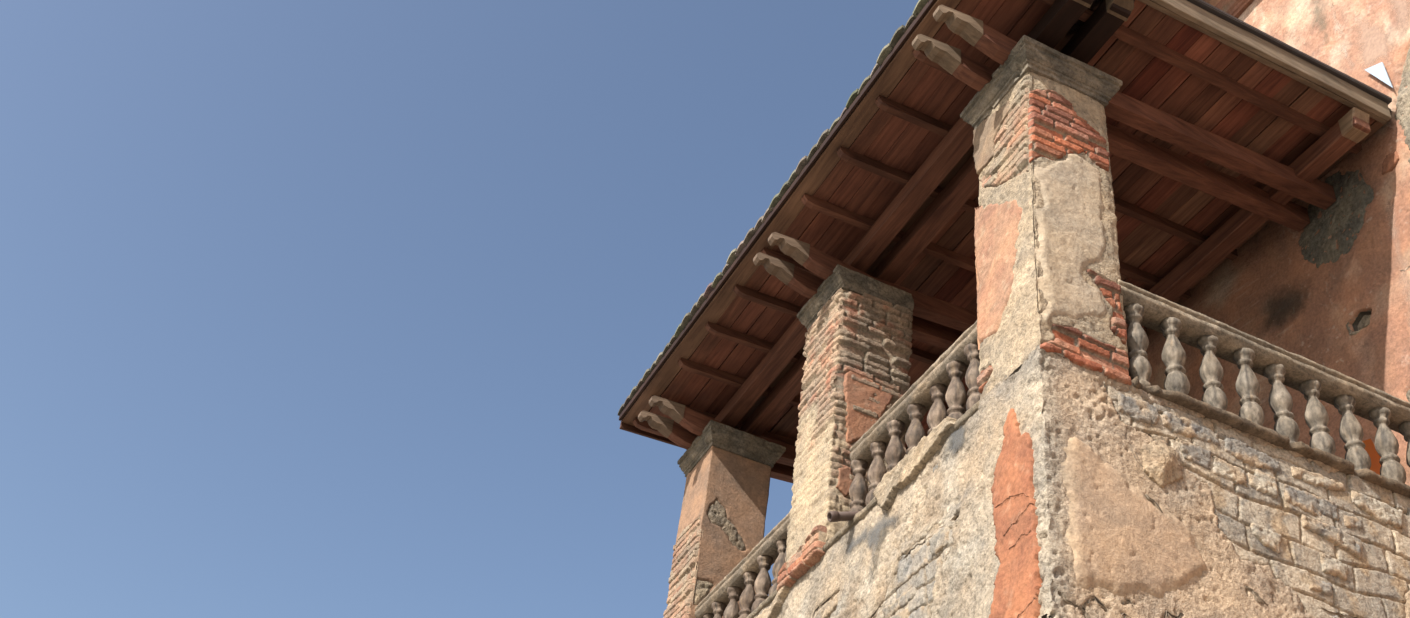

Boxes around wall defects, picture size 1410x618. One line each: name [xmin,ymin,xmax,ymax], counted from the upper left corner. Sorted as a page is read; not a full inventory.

spalling [979,75,1110,188]
spalling [1298,48,1410,268]
spalling [815,595,838,618]
spalling [875,512,956,618]
flaking render [988,408,1051,618]
spalling [1040,269,1410,618]